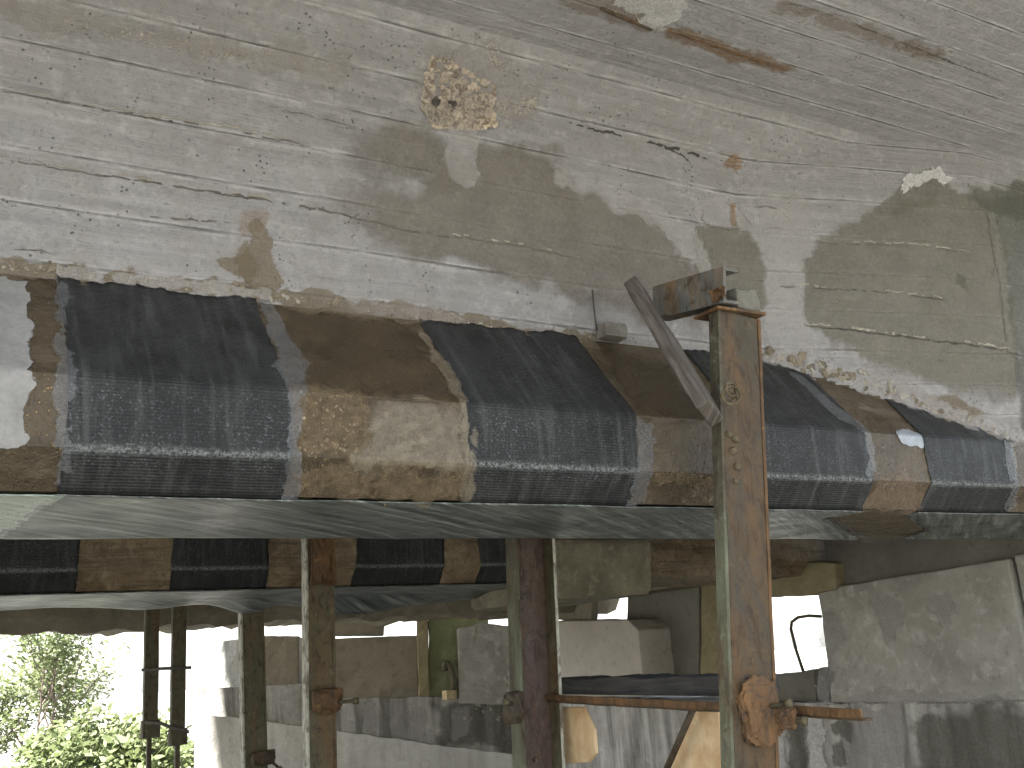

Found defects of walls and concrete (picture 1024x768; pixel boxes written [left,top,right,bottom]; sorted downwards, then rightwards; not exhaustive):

corrosion [667,27,790,72]
spalling [421,55,538,131]
crack [569,122,621,137]
crack [647,141,723,162]
leakage [367,125,766,316]
leakage [217,221,283,297]
leakage [806,166,1024,426]